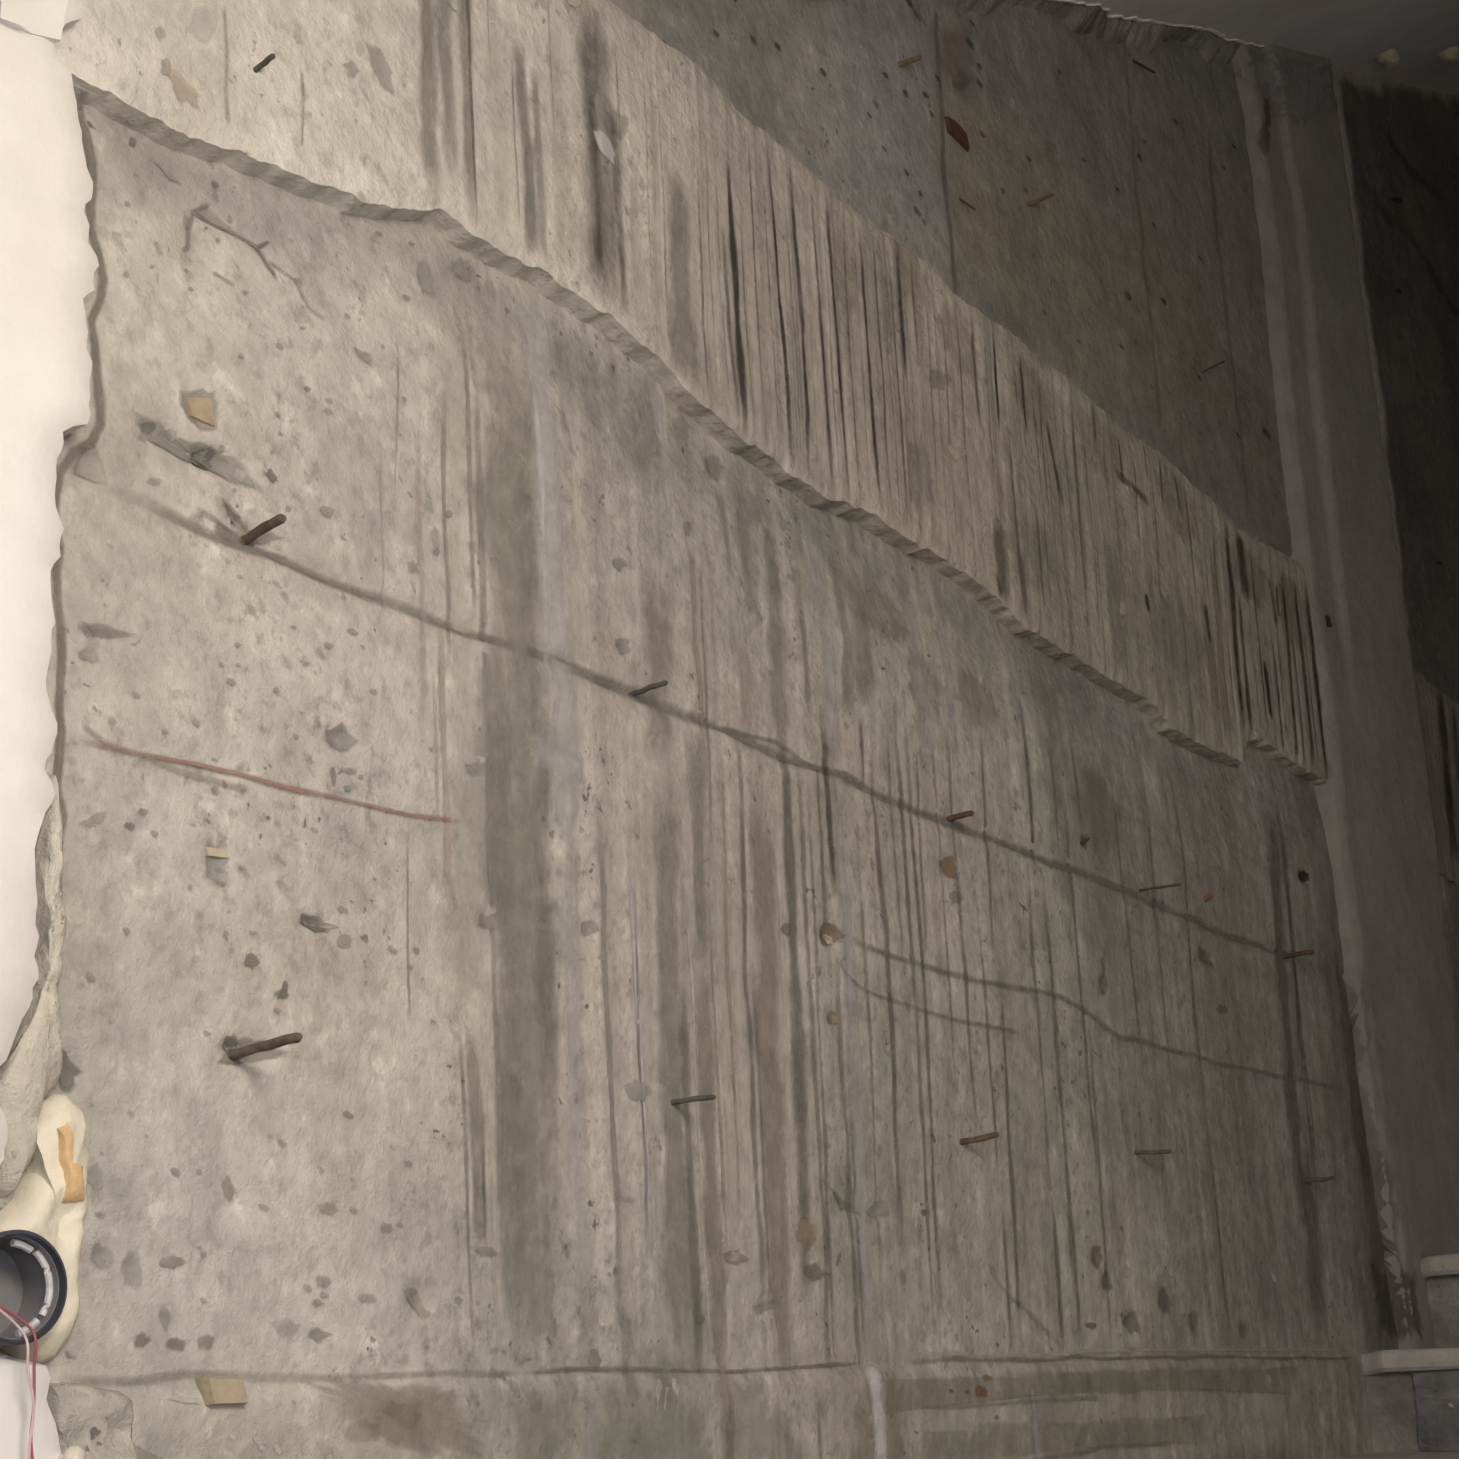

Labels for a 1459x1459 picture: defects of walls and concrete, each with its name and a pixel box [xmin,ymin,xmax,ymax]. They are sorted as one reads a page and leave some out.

water stain [422,0,476,180]
water stain [655,175,917,476]
crack [86,728,450,821]
water stain [469,598,586,1237]
water stain [602,871,621,1264]
water stain [630,760,808,1459]
crack [169,506,1284,954]
water stain [900,786,931,1106]
crack [872,948,1326,1087]
water stain [1213,538,1327,768]
crack [499,1363,849,1374]
crack [948,1347,1344,1362]